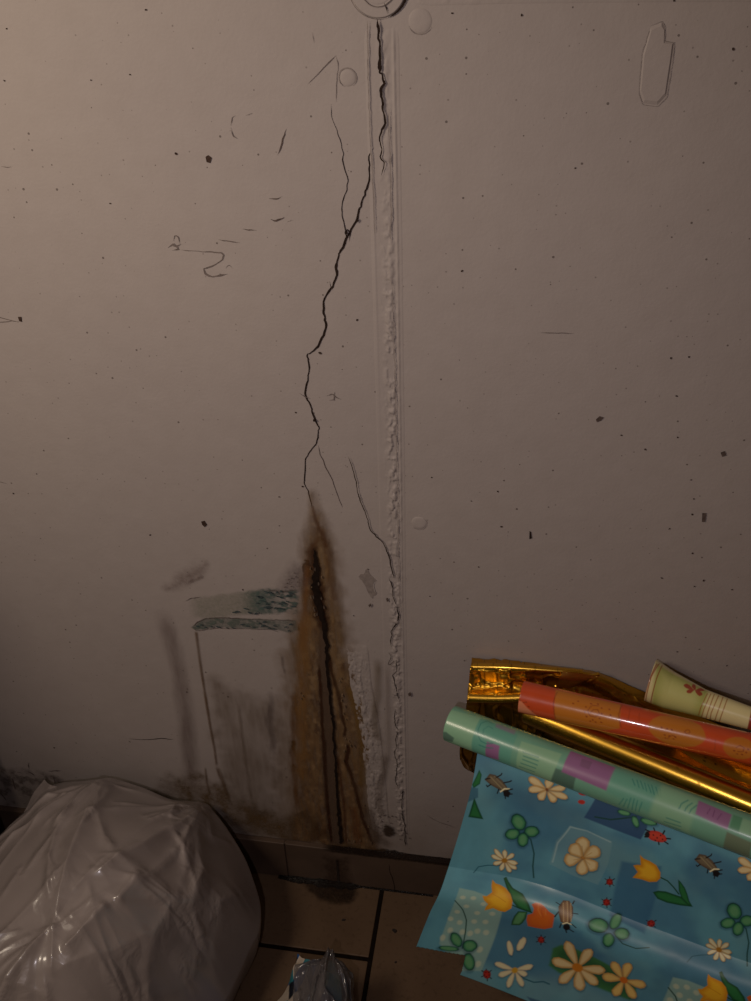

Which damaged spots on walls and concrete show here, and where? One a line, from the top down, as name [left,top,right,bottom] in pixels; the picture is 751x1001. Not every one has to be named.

rust [291,513,376,849]
crack [304,4,406,845]